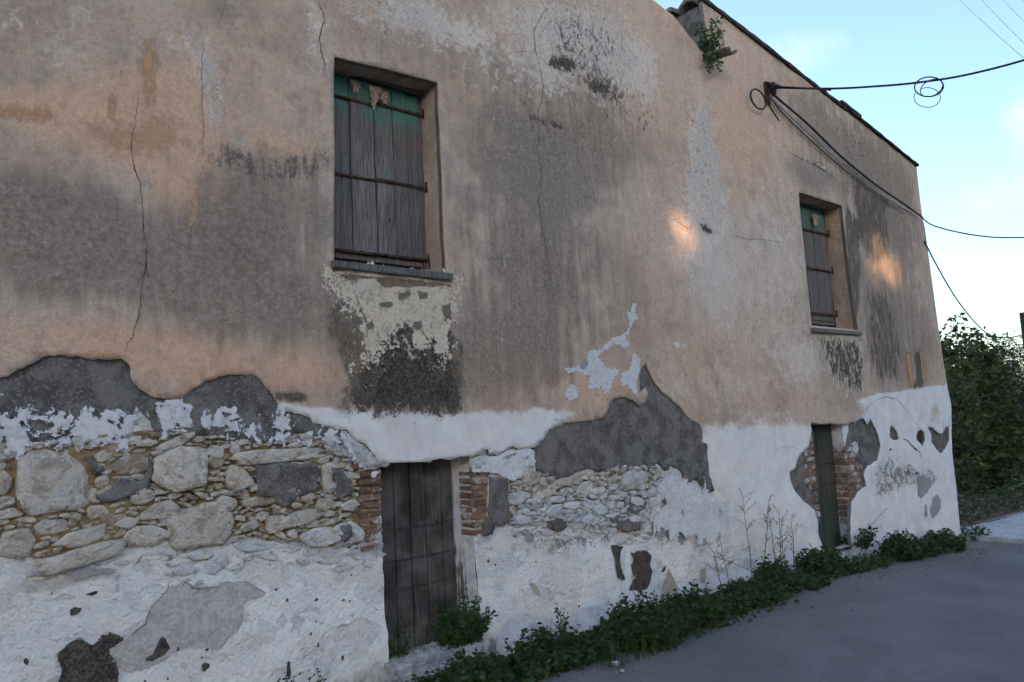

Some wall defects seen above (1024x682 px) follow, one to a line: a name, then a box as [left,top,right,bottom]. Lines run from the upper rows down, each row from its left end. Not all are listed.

crack [318,3,332,85]
leakage [486,0,638,96]
leakage [211,145,264,174]
crack [51,86,149,394]
peeling [318,259,466,389]
leakage [845,173,899,381]
flaking render [0,355,390,478]
flaking render [472,300,735,599]
flaking render [790,424,821,523]
flaking render [832,419,941,523]
flaking render [916,427,947,453]
peeling [56,580,277,682]